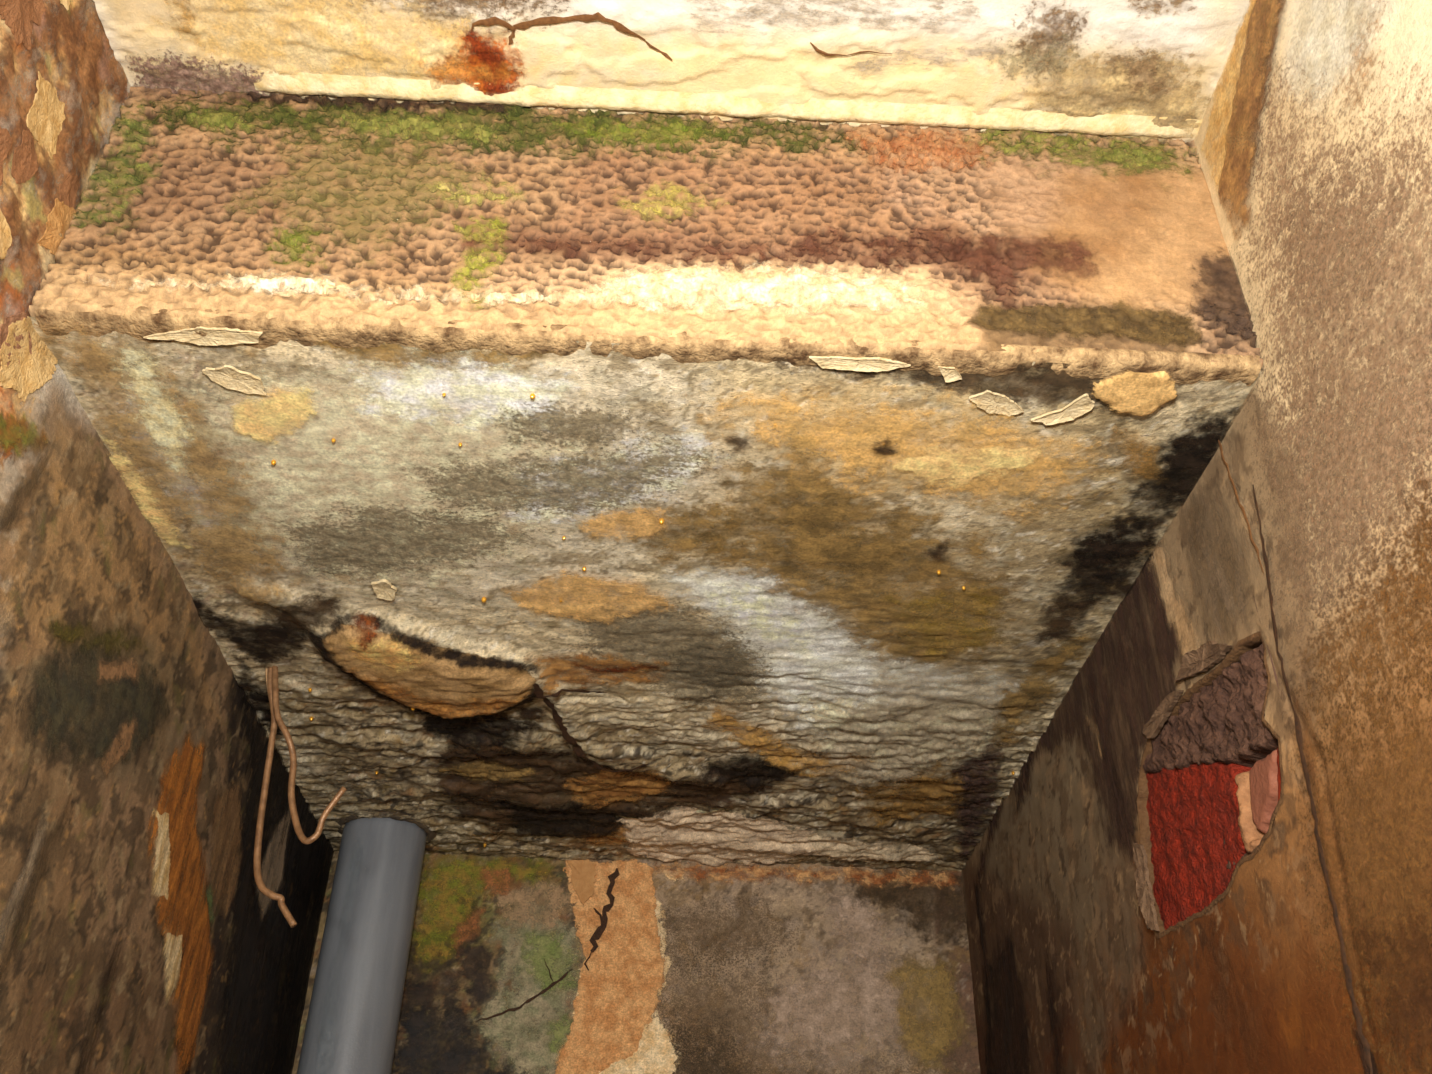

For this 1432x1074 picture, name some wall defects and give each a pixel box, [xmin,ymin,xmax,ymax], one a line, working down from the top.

leakage [129,273,433,305]
leakage [172,0,568,113]
rust [428,29,524,106]
crack [471,12,672,60]
spalling [0,0,1384,425]
crack [475,868,620,1022]
leakage [65,338,1246,1074]
peeling [426,736,942,1074]
leakage [459,0,1432,1074]
peeling [894,446,1042,488]
spalling [1133,596,1284,939]
crack [1218,440,1379,1074]